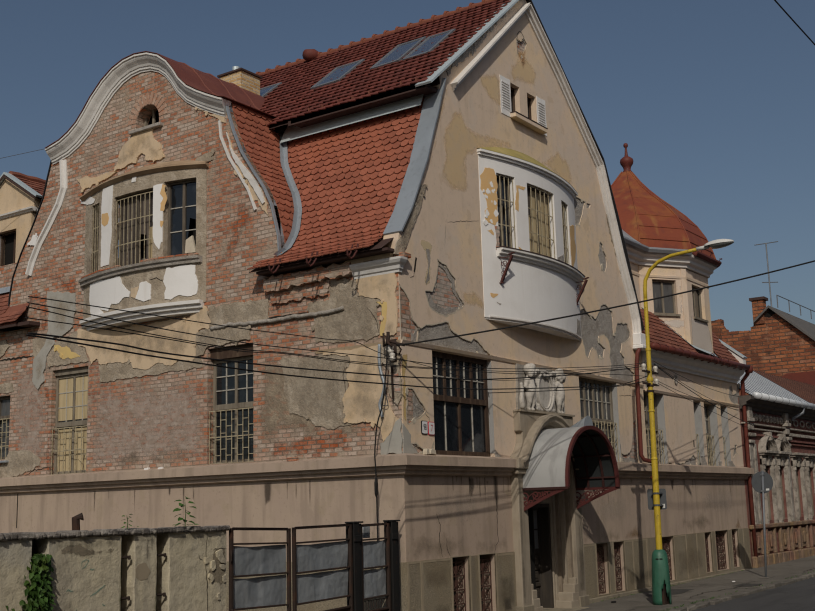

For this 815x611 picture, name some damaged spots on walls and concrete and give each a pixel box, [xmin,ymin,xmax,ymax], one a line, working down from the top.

peeling [480,168,500,250]
peeling [598,214,616,273]
flaking render [377,240,491,425]
peeling [576,304,635,384]
peeling [273,432,344,455]
crack [199,533,224,611]